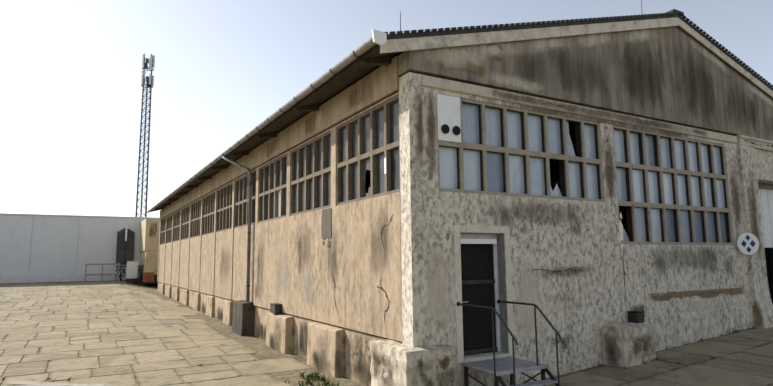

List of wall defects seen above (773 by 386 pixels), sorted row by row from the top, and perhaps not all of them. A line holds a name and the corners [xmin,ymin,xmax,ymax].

leakage [437,43,510,73]
leakage [496,76,681,136]
leakage [417,105,435,168]
leakage [300,324,323,371]
leakage [355,361,371,384]